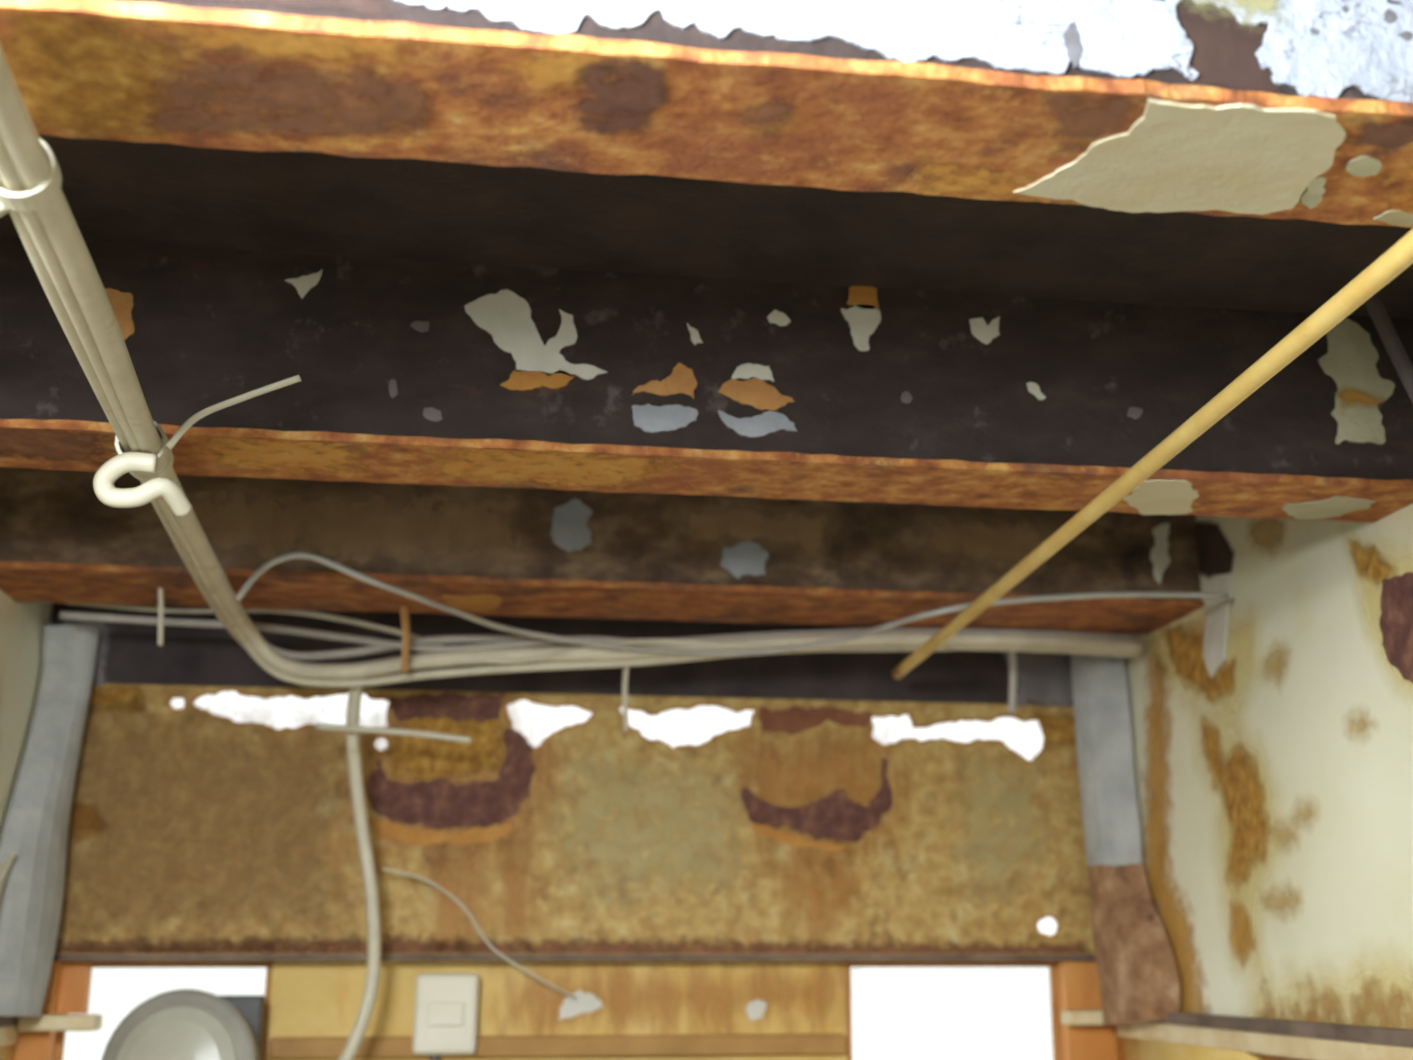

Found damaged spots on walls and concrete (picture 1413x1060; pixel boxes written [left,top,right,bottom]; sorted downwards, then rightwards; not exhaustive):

corrosion [0,12,417,134]
peeling [395,0,1413,102]
corrosion [0,428,116,465]
peeling [465,289,608,391]
peeling [632,363,698,433]
peeling [718,363,797,437]
peeling [1318,318,1395,444]
corrosion [1351,542,1413,683]
corrosion [1038,714,1076,745]
corrosion [1144,522,1248,1014]
leakage [54,708,1090,954]
corrosion [1202,722,1311,964]